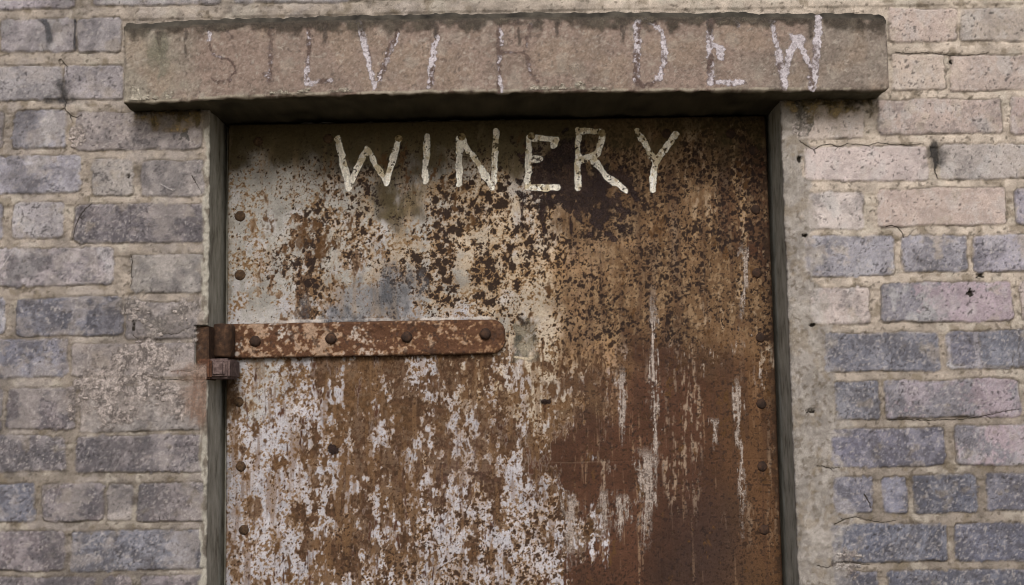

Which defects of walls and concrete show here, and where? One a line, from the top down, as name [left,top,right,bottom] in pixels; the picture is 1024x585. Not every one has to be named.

crack [799,140,937,176]
rust [507,127,642,242]
crack [834,494,896,525]